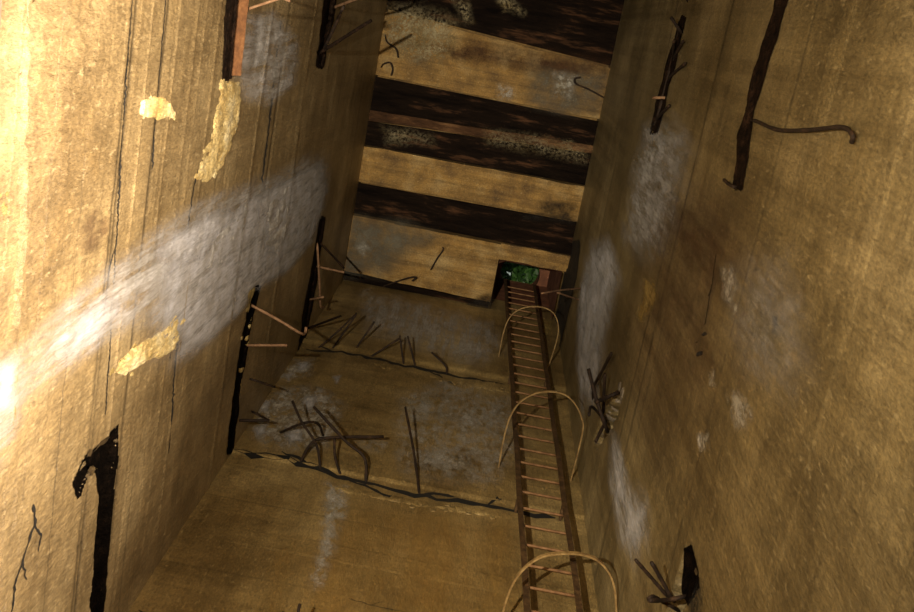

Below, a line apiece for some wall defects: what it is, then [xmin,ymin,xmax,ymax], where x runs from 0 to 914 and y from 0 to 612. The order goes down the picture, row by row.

water stain [388,11,453,58]
spalling [140,95,176,120]
spalling [194,79,241,182]
water stain [630,132,681,246]
peeling [109,316,186,377]
crack [306,347,502,384]
spalling [587,352,624,450]
crack [235,449,555,518]
spalling [634,544,700,612]